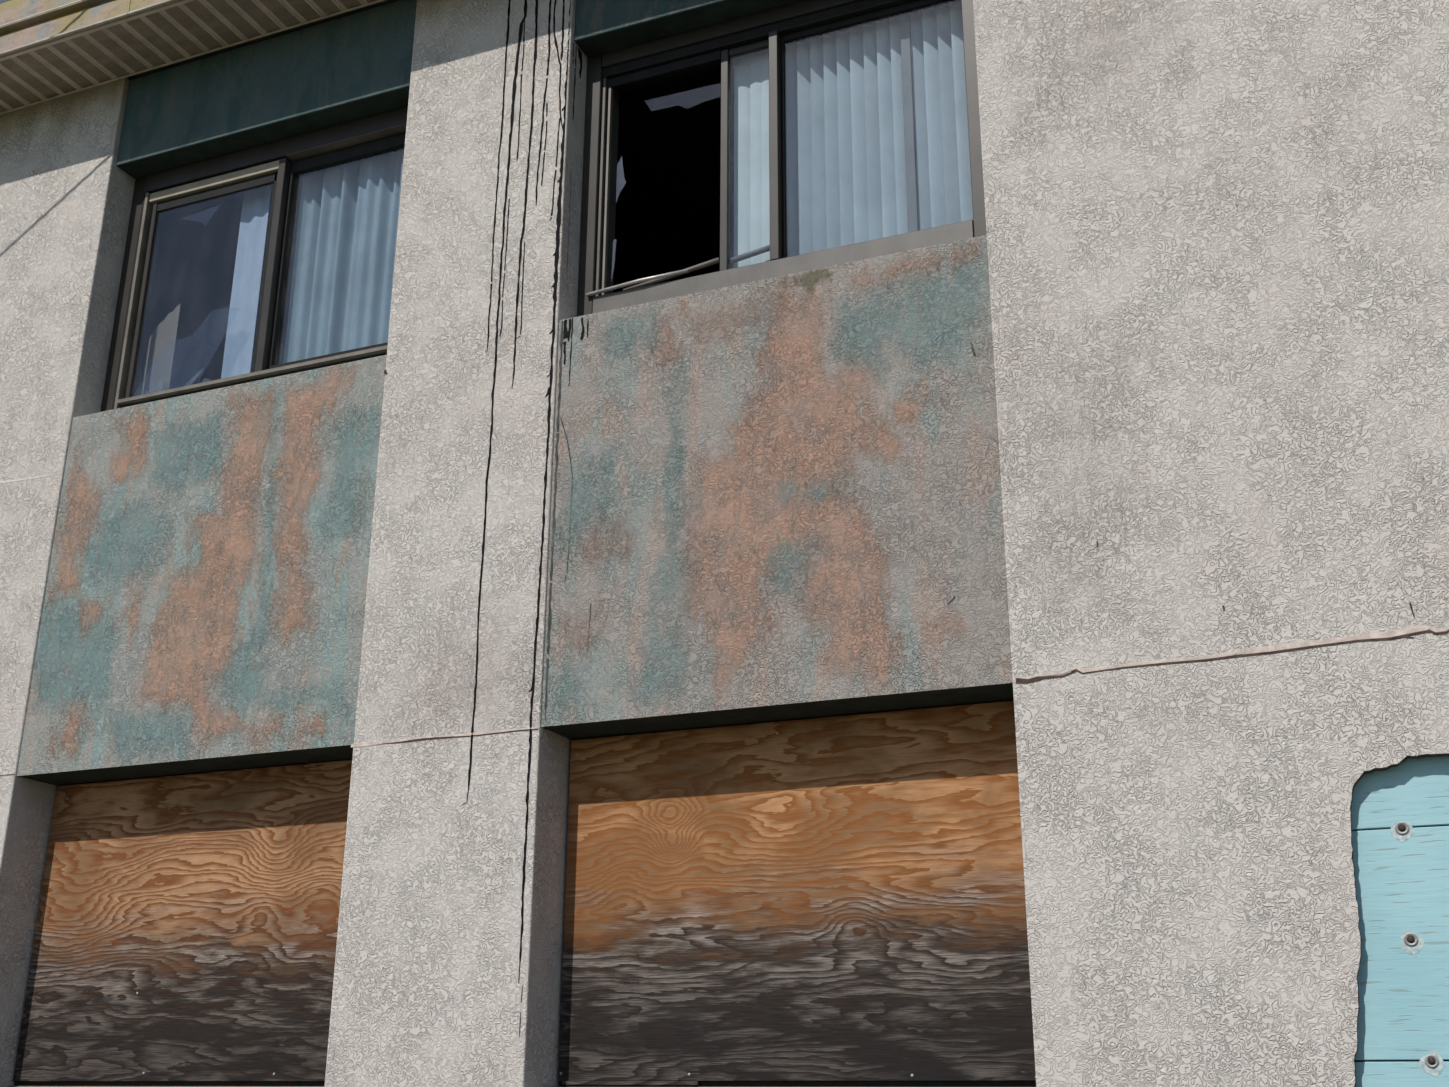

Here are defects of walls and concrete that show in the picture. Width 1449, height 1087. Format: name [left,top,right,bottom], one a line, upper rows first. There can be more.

water stain [462,0,589,1037]
crack [1016,602,1449,683]
spalling [1350,753,1449,1087]